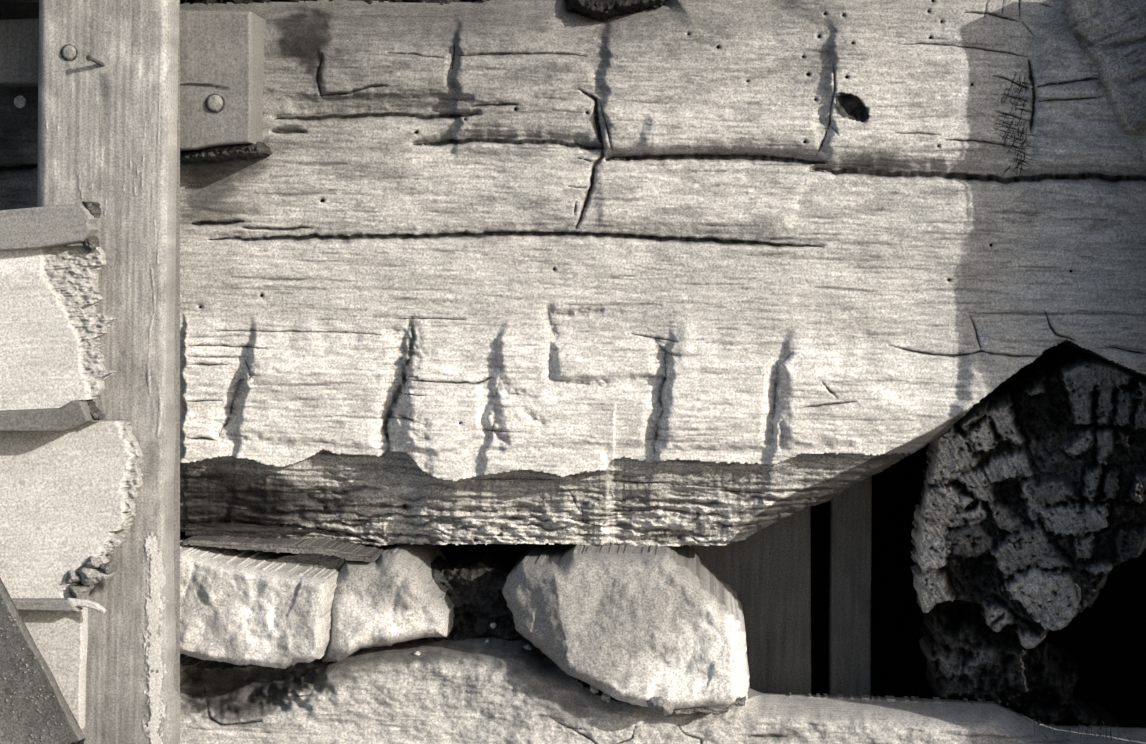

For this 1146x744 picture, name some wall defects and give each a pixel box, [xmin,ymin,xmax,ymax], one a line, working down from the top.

water stain [279,8,331,80]
crack [190,0,1146,247]
crack [552,718,636,744]
crack [751,732,786,740]